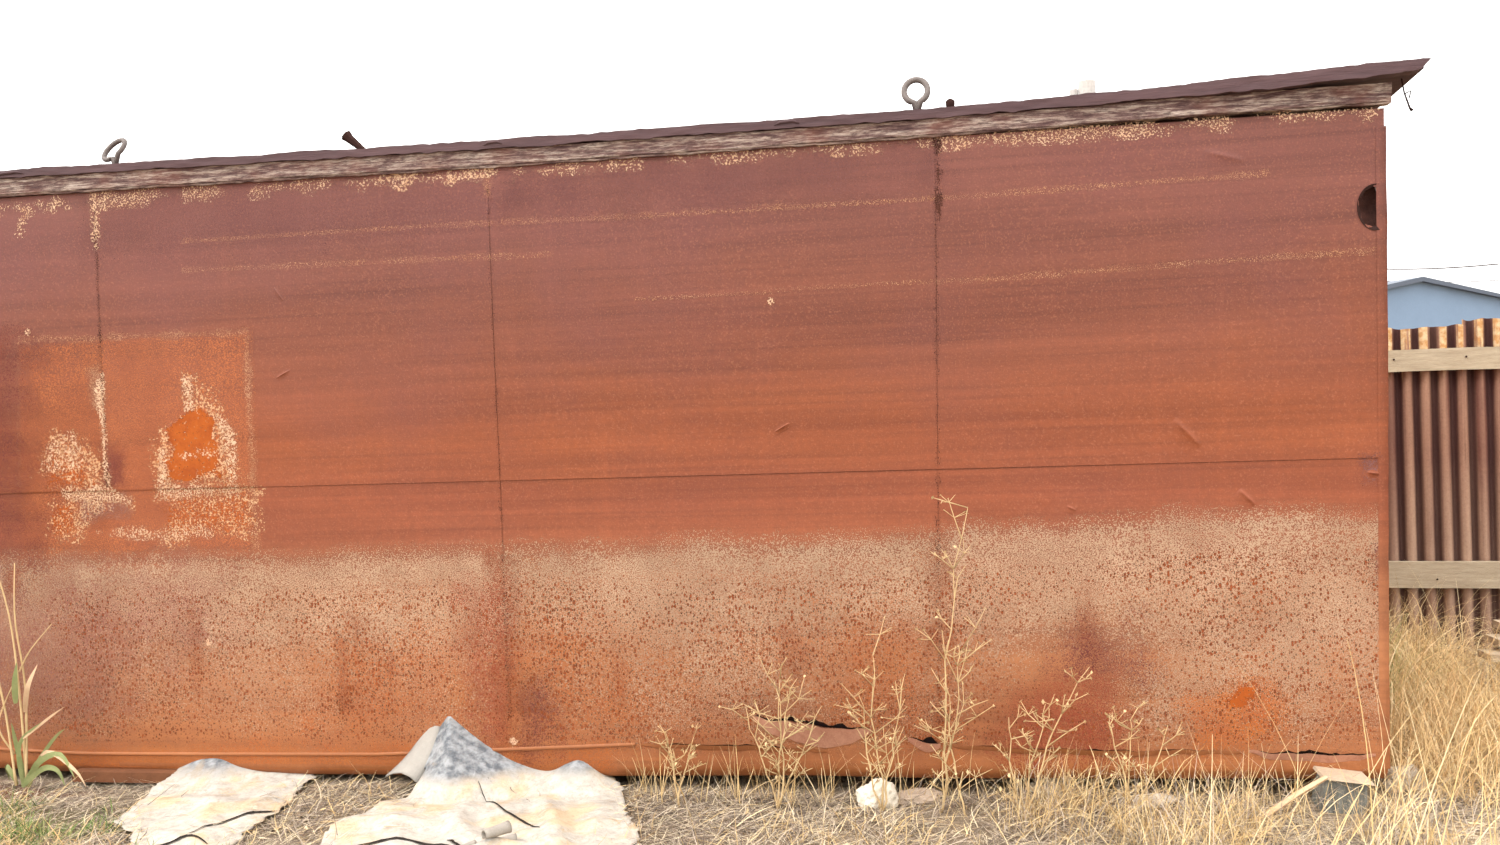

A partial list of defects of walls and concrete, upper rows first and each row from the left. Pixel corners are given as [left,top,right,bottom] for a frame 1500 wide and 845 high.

peeling [667,115,1236,165]
peeling [1254,107,1380,125]
peeling [0,194,70,239]
peeling [88,185,225,212]
peeling [247,157,644,201]
peeling [31,372,266,550]
corrosion [805,546,1151,776]
corrosion [1174,674,1294,766]